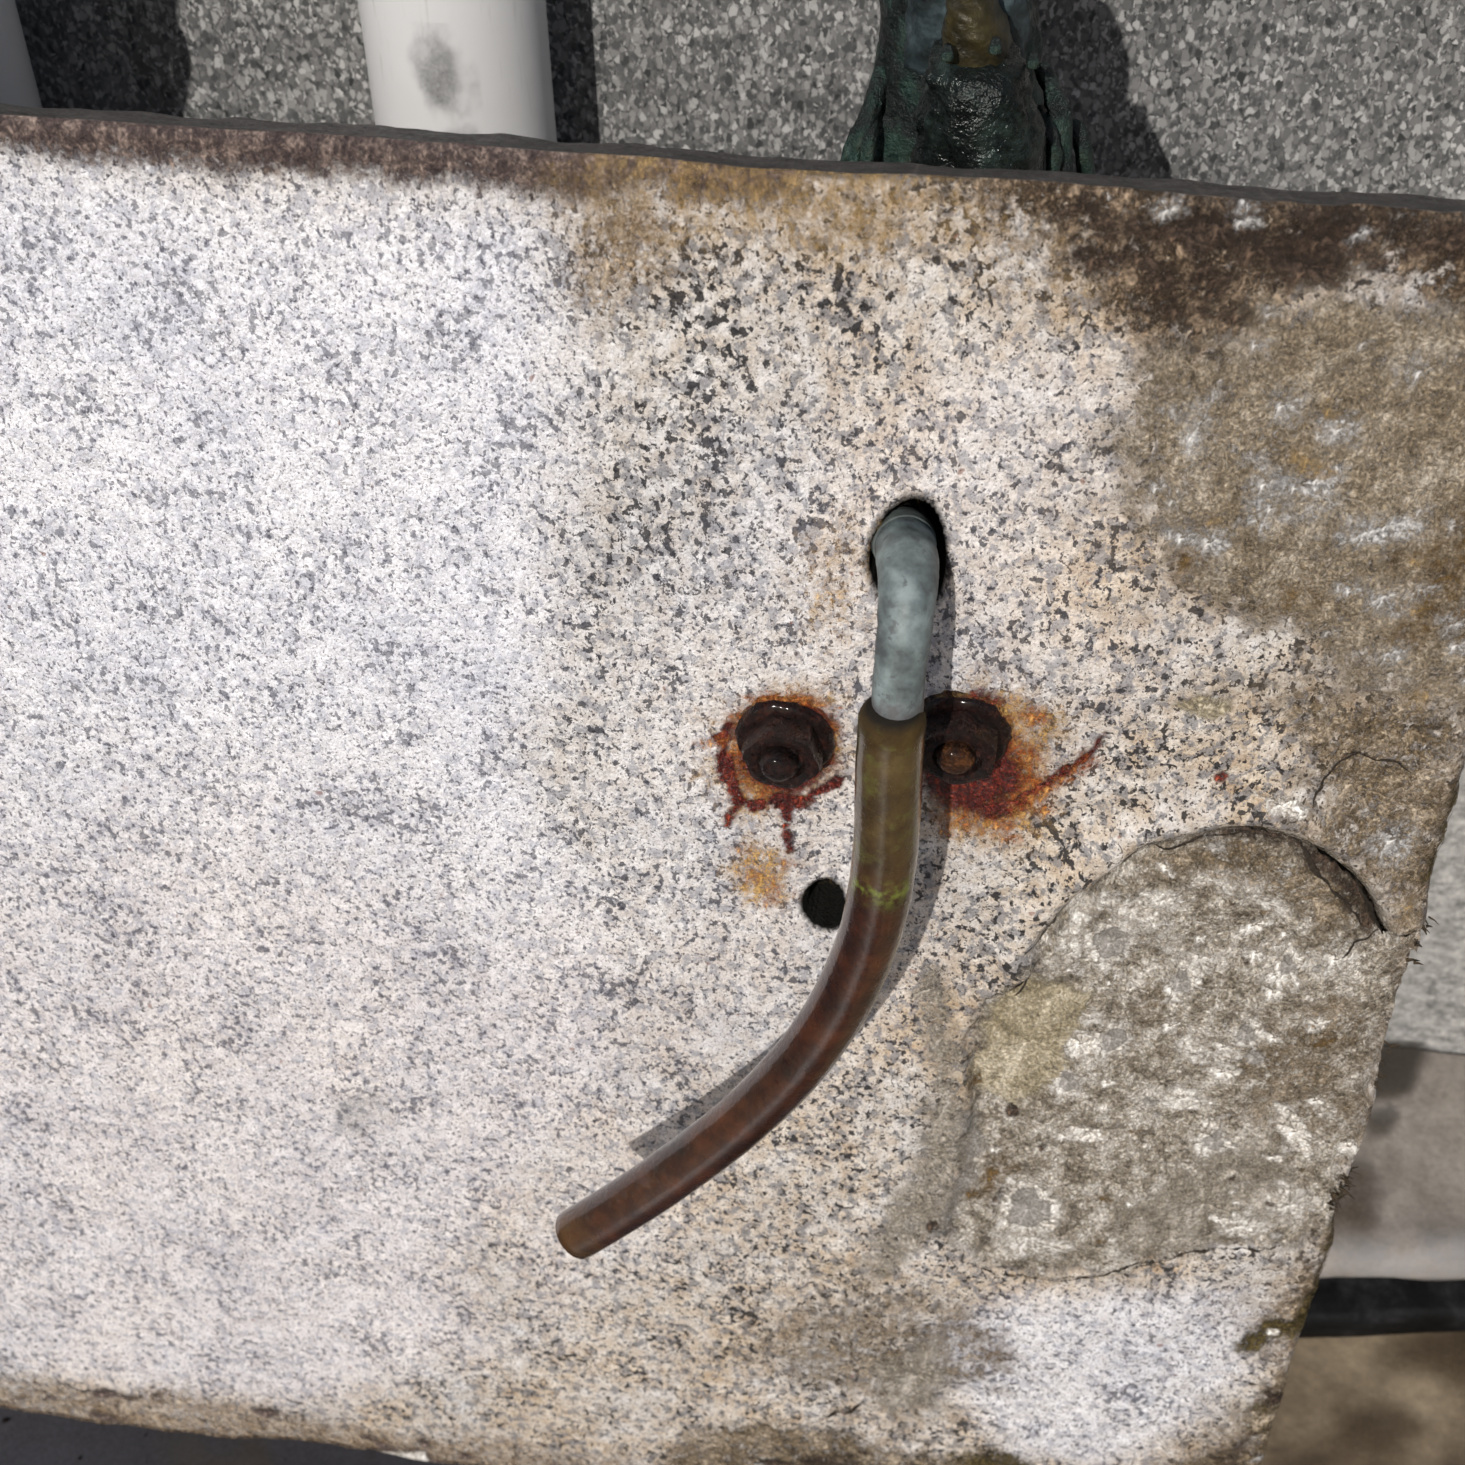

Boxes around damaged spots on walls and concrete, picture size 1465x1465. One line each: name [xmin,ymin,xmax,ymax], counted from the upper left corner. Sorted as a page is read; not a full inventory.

corrosion [700,691,845,907]
corrosion [922,688,1104,842]
spalling [926,791,1412,1278]